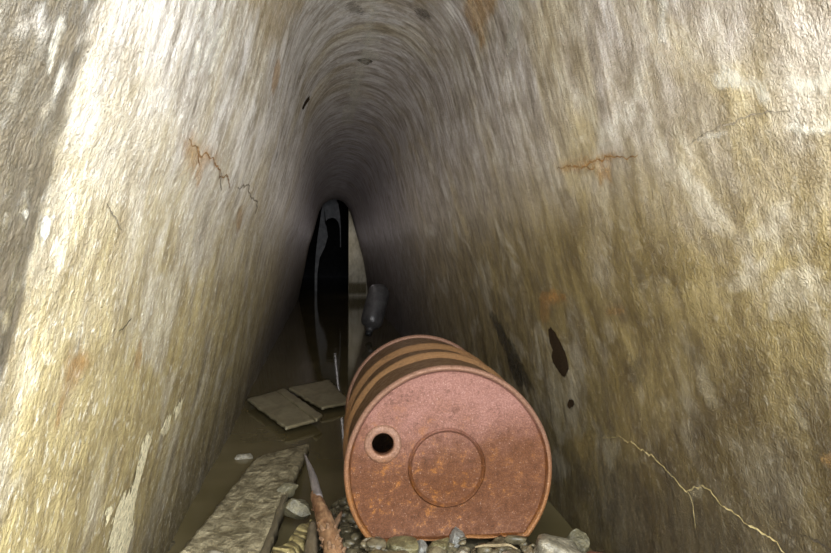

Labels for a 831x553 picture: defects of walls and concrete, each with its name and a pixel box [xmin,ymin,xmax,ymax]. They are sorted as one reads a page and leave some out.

damp [0,0,98,377]
crack [189,138,258,214]
crack [557,155,636,170]
spalling [548,327,569,377]
flaking render [105,398,183,553]
crack [601,435,784,553]